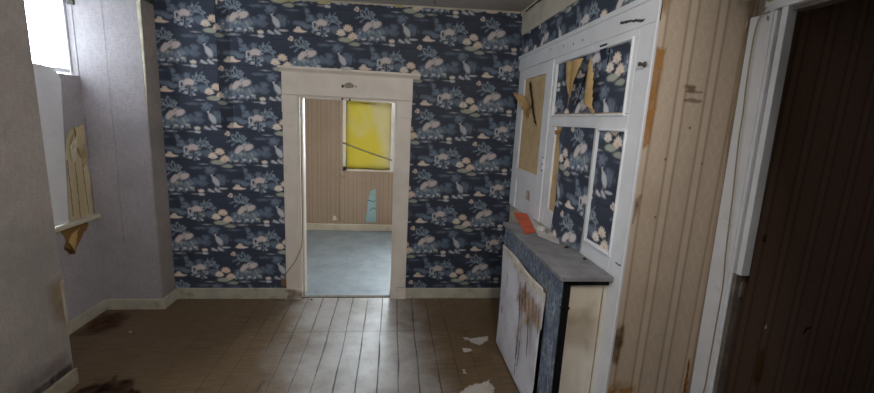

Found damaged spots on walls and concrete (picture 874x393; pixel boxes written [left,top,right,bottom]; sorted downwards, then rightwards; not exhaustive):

water stain [34,367,72,393]